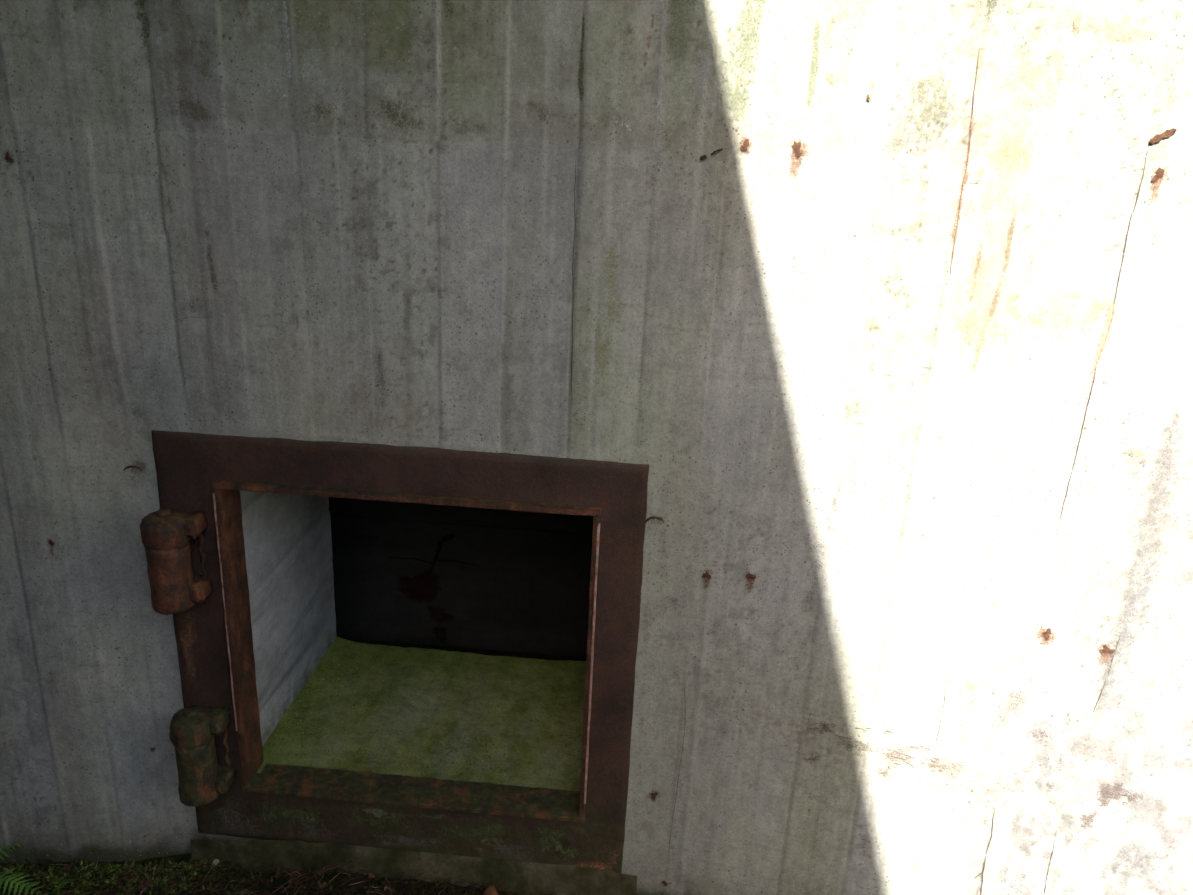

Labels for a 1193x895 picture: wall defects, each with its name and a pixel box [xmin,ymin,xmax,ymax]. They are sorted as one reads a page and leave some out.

rust [1149,128,1177,144]
rust [788,139,807,176]
rust [952,118,974,257]
rust [1151,167,1168,201]
rust [1038,626,1057,645]
rust [1098,644,1117,663]
water stain [1081,777,1148,828]